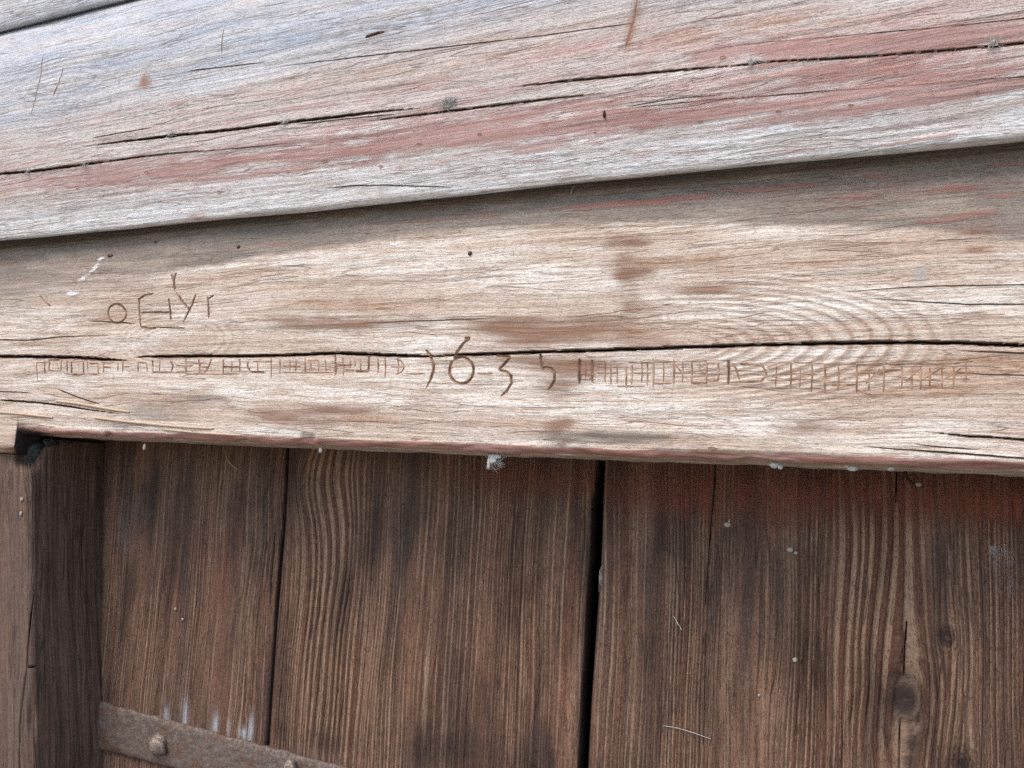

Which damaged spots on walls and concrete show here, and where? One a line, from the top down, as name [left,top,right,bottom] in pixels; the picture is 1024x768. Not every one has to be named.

crack [0,18,1024,175]
crack [374,317,475,325]
crack [0,321,1024,376]